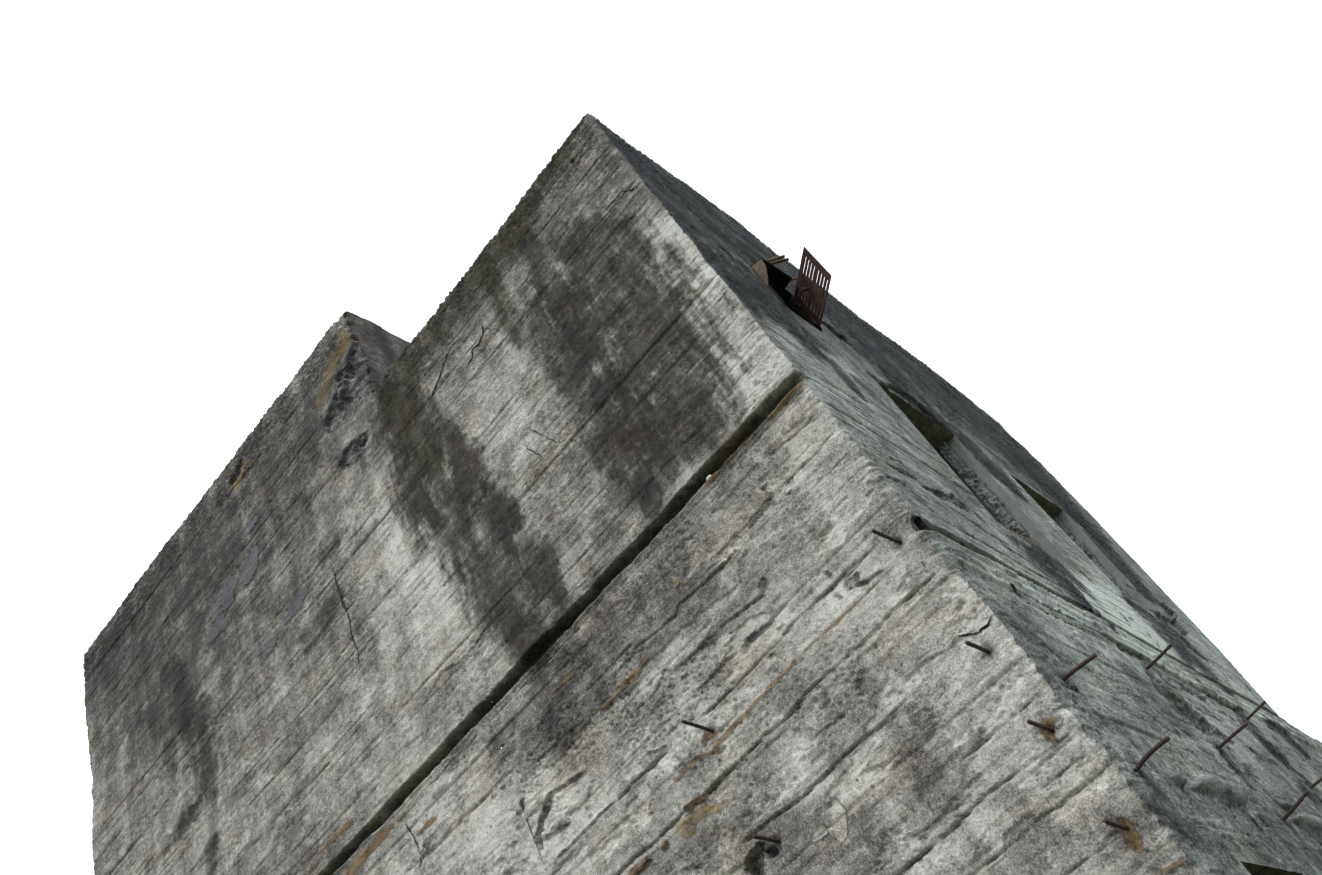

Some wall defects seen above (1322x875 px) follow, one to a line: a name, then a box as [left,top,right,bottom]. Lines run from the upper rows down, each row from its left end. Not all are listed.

damp [367,370,568,669]
damp [482,112,1322,804]
corrosion [1039,716,1059,742]